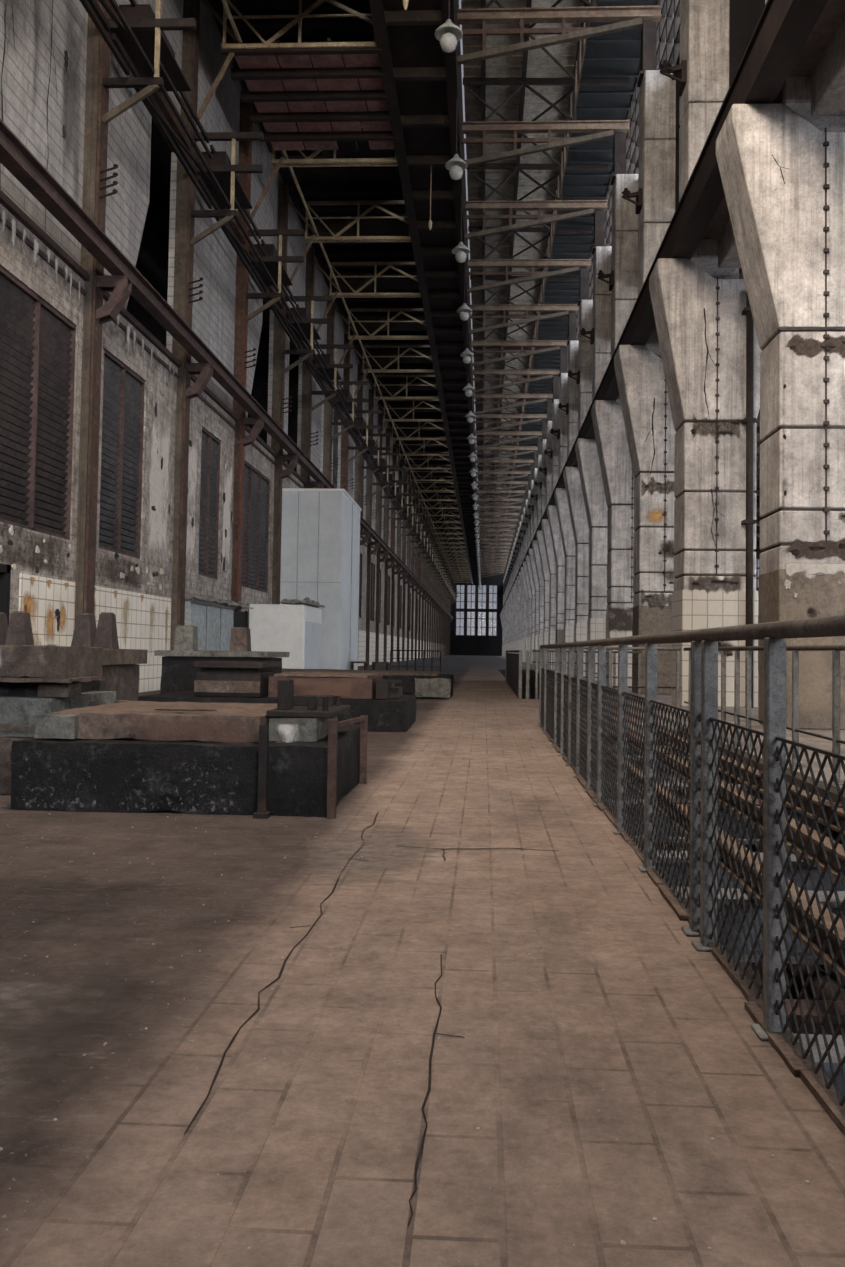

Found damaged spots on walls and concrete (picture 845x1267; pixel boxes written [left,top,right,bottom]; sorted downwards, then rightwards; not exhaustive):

spalling [786,334,845,358]
spalling [691,417,740,440]
peeling [0,525,71,574]
spalling [784,538,845,598]
rust [24,577,68,617]
crack [184,812,378,1134]
crack [408,954,464,1225]